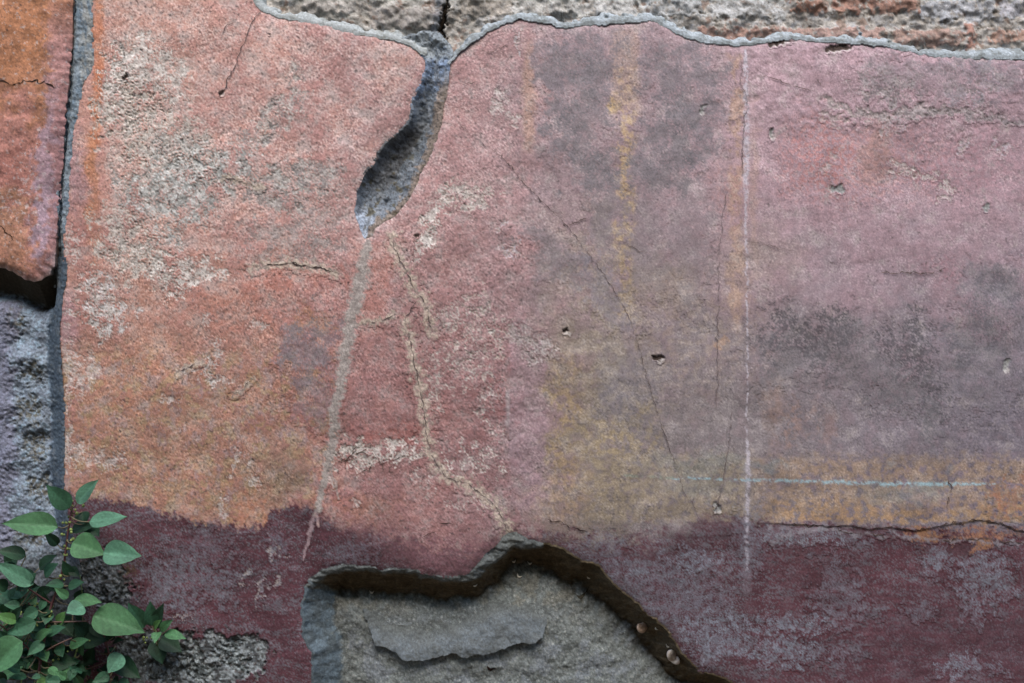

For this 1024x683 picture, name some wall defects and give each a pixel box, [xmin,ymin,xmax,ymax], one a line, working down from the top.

crack [222,11,261,93]
peeling [0,12,453,659]
crack [243,226,519,562]
peeling [412,278,568,488]
crack [458,122,732,513]
spalling [103,612,277,683]
water stain [127,518,292,630]
water stain [312,532,383,569]
peeling [329,432,492,517]
spalling [300,532,734,683]
water stain [564,496,1024,683]
crack [768,481,1024,548]